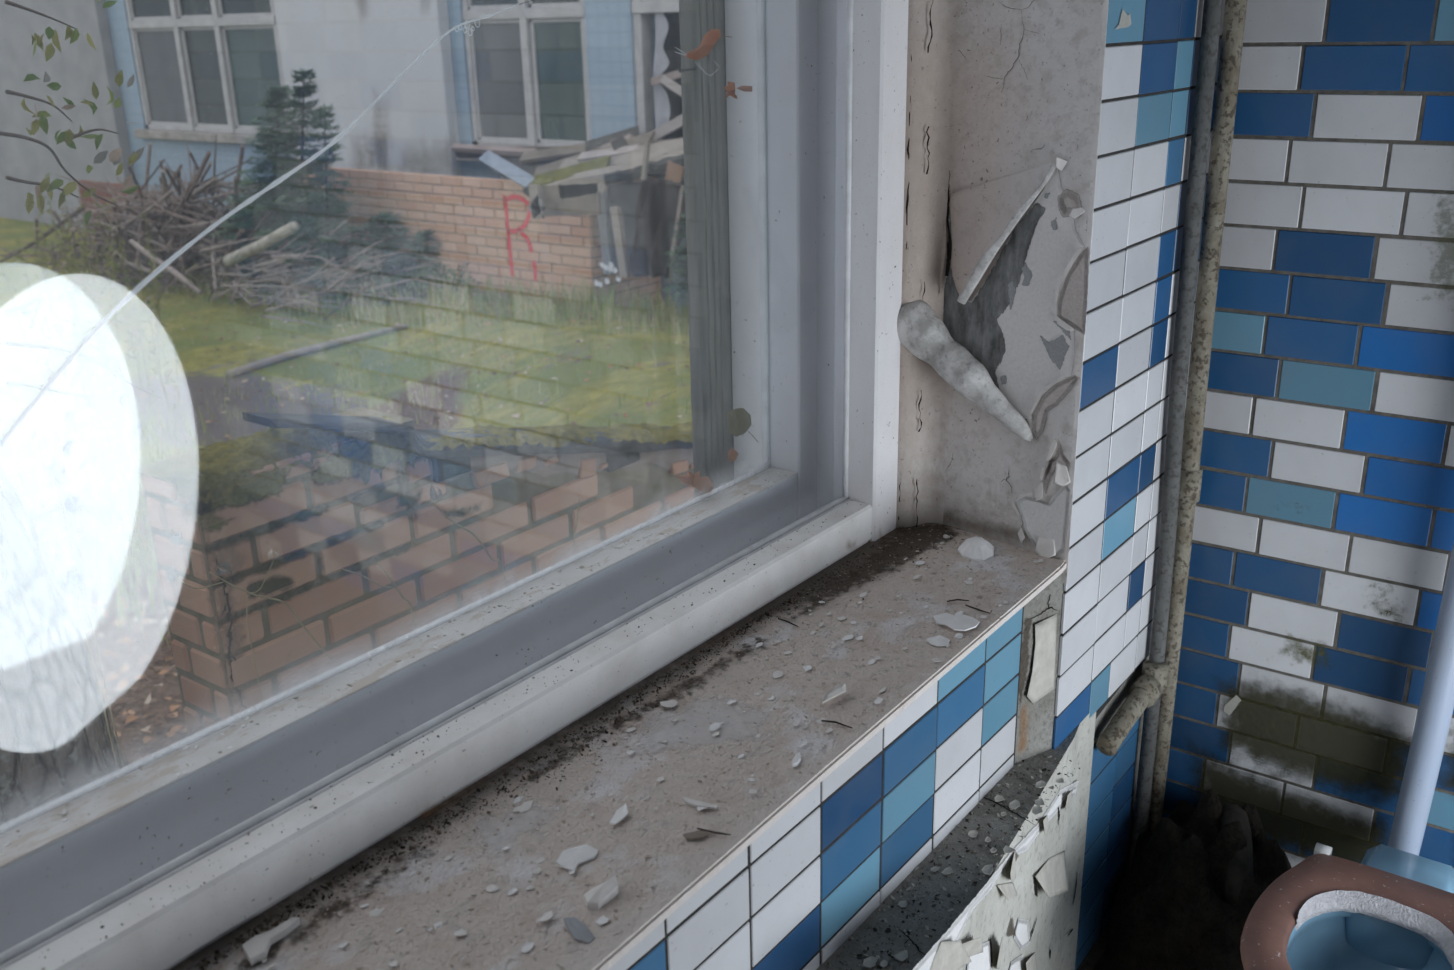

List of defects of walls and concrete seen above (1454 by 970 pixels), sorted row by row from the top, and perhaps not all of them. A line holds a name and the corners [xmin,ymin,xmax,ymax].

peeling [897,156,1089,563]
damp [1197,684,1411,863]
peeling [913,781,1079,970]